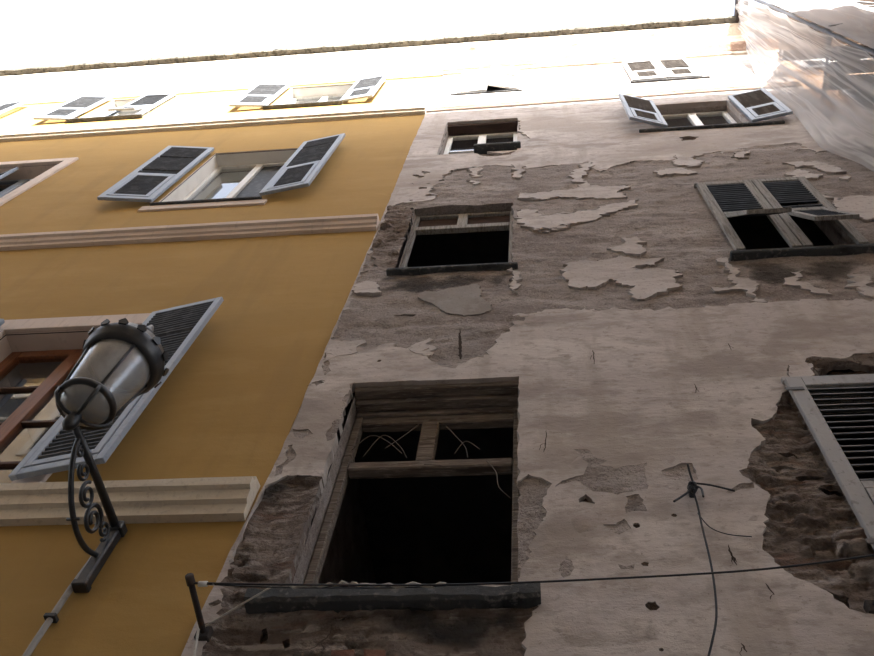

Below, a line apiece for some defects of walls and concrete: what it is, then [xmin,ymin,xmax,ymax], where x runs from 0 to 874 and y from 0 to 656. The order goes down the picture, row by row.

flaking render [313,143,874,386]
damp [755,265,794,283]
spalling [201,430,538,656]
damp [382,607,516,647]
spalling [726,391,874,614]